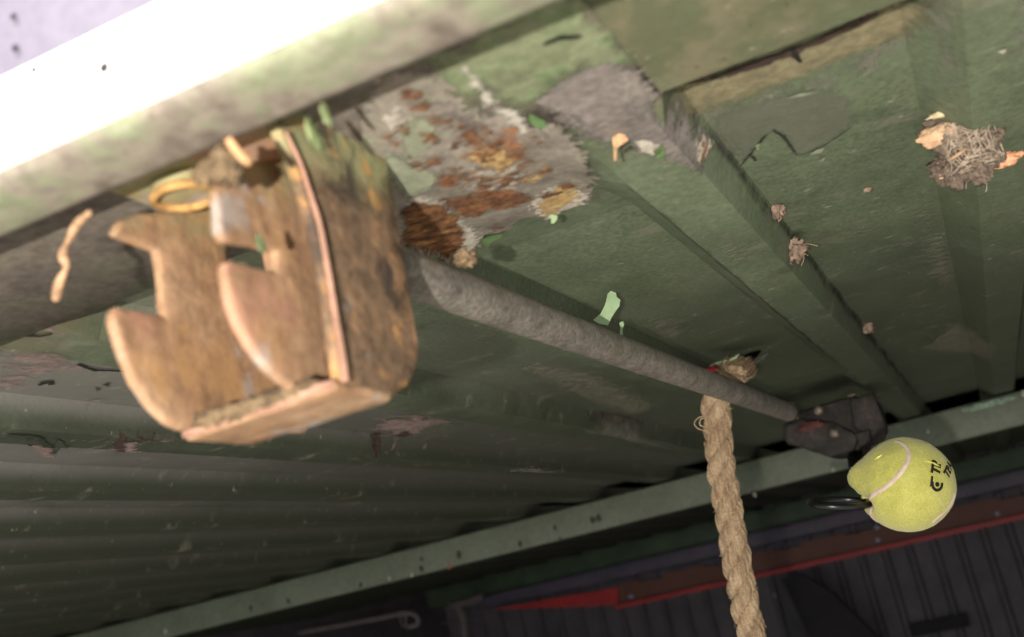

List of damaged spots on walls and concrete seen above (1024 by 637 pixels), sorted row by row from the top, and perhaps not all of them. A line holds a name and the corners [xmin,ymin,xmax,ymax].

rust [359,70,601,264]
peeling [426,0,714,175]